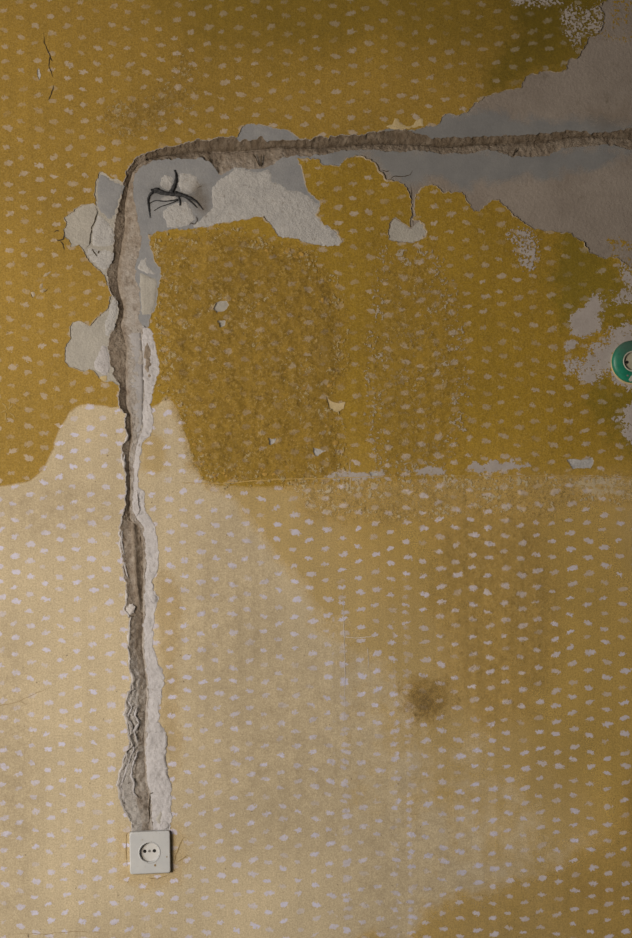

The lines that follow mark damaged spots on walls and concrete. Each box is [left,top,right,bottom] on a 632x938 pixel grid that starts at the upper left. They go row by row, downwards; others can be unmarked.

peeling [236,123,310,142]
peeling [377,0,632,139]
peeling [63,144,632,521]
leakage [148,157,632,938]